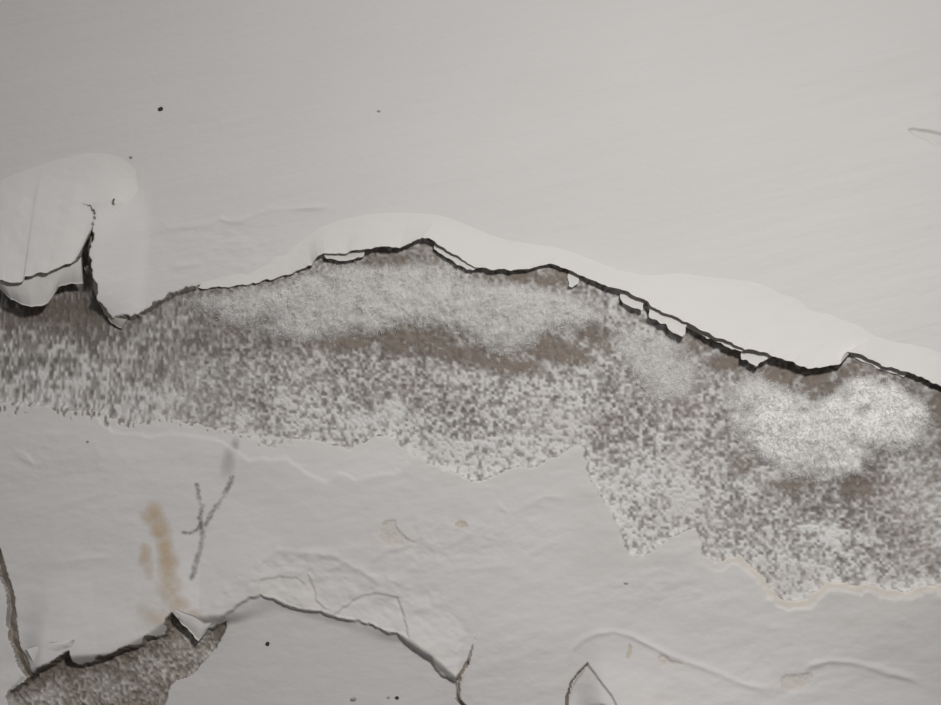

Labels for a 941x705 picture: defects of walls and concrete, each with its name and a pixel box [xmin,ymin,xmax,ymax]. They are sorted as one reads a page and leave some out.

flaking render [0,232,941,602]
water stain [713,351,941,497]
crack [0,549,33,678]
peeling [0,547,476,705]
crack [455,649,473,705]